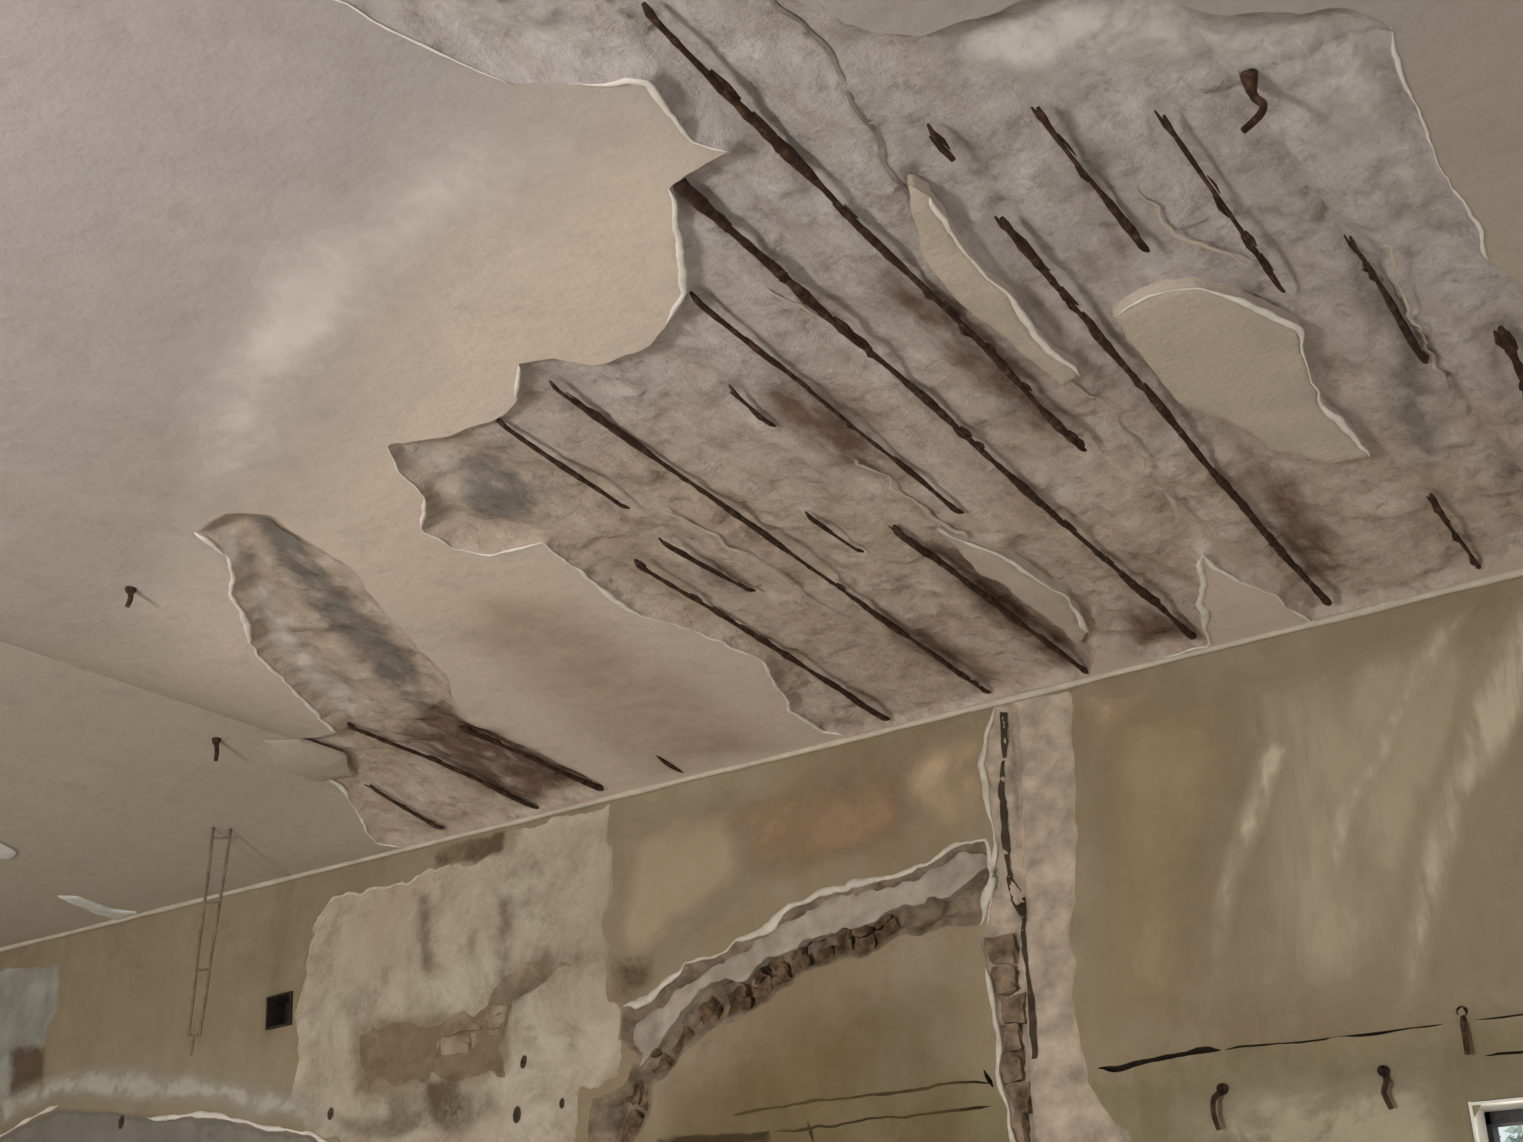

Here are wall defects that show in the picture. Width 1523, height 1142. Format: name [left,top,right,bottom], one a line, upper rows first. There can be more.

rust [404,707,569,798]
flaking render [289,722,988,1142]
spalling [549,380,991,694]
rust [774,391,875,468]
flaking render [627,2,1087,452]
spalling [674,177,1197,640]
rust [894,280,1045,423]
flaking render [888,523,1089,674]
rust [940,550,1068,663]
rust [1131,615,1174,643]
flaking render [994,106,1368,606]
water stain [1240,614,1523,986]